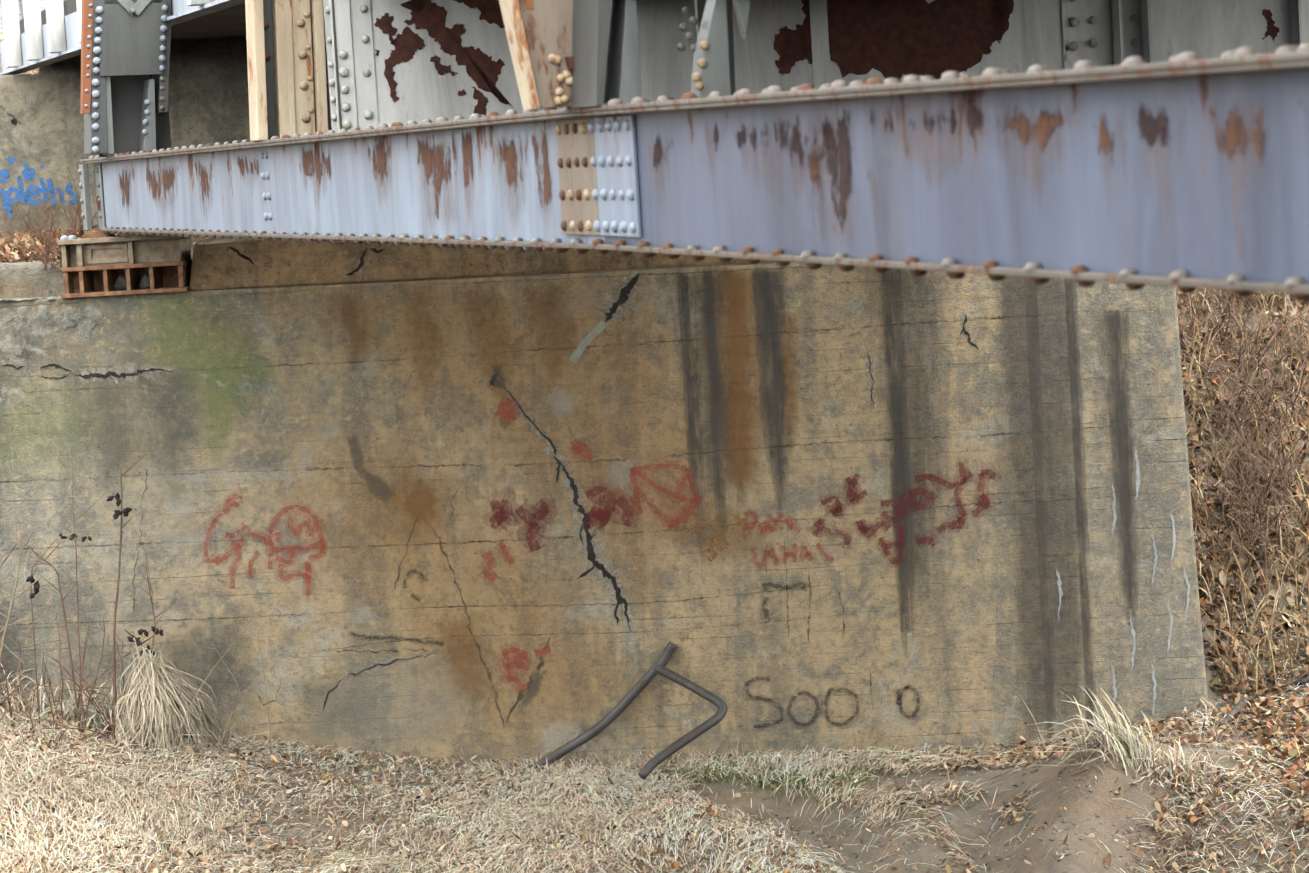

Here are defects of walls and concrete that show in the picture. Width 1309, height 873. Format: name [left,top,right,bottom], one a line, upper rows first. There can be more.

peeling [374,0,513,115]
peeling [774,0,812,75]
peeling [827,0,1014,80]
corrosion [299,145,331,186]
corrosion [417,128,473,218]
corrosion [497,133,552,208]
corrosion [737,110,852,232]
spalling [0,297,106,367]
crack [595,272,640,327]
crack [2,363,184,385]
crack [489,375,631,630]
crack [394,495,550,728]